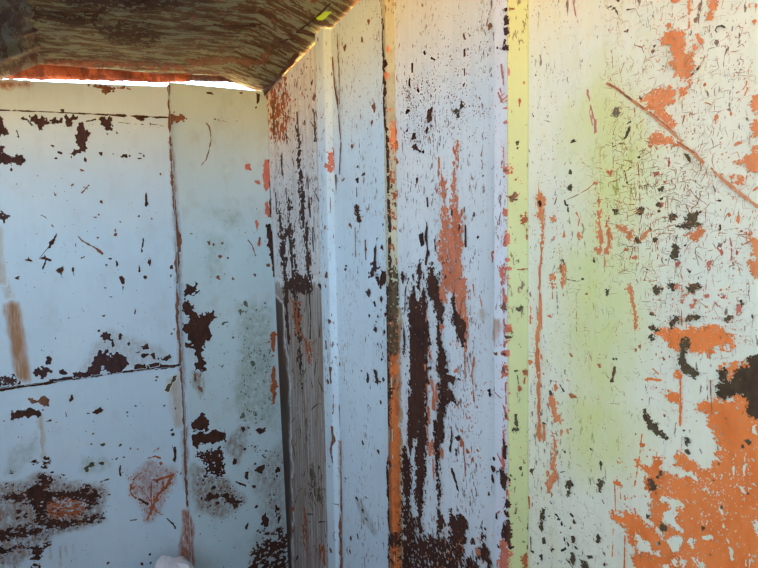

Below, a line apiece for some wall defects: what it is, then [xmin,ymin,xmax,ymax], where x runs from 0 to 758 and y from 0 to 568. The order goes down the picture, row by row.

peeling [0,456,109,568]
peeling [0,85,266,529]
corrosion [72,140,252,568]
corrosion [170,111,187,125]
corrosion [221,65,343,568]
corrosion [379,0,404,568]
peeling [361,140,543,568]
crack [549,0,758,506]
peeling [639,0,704,148]
peeling [596,282,758,568]
peeling [727,213,758,279]
peeling [728,80,758,186]